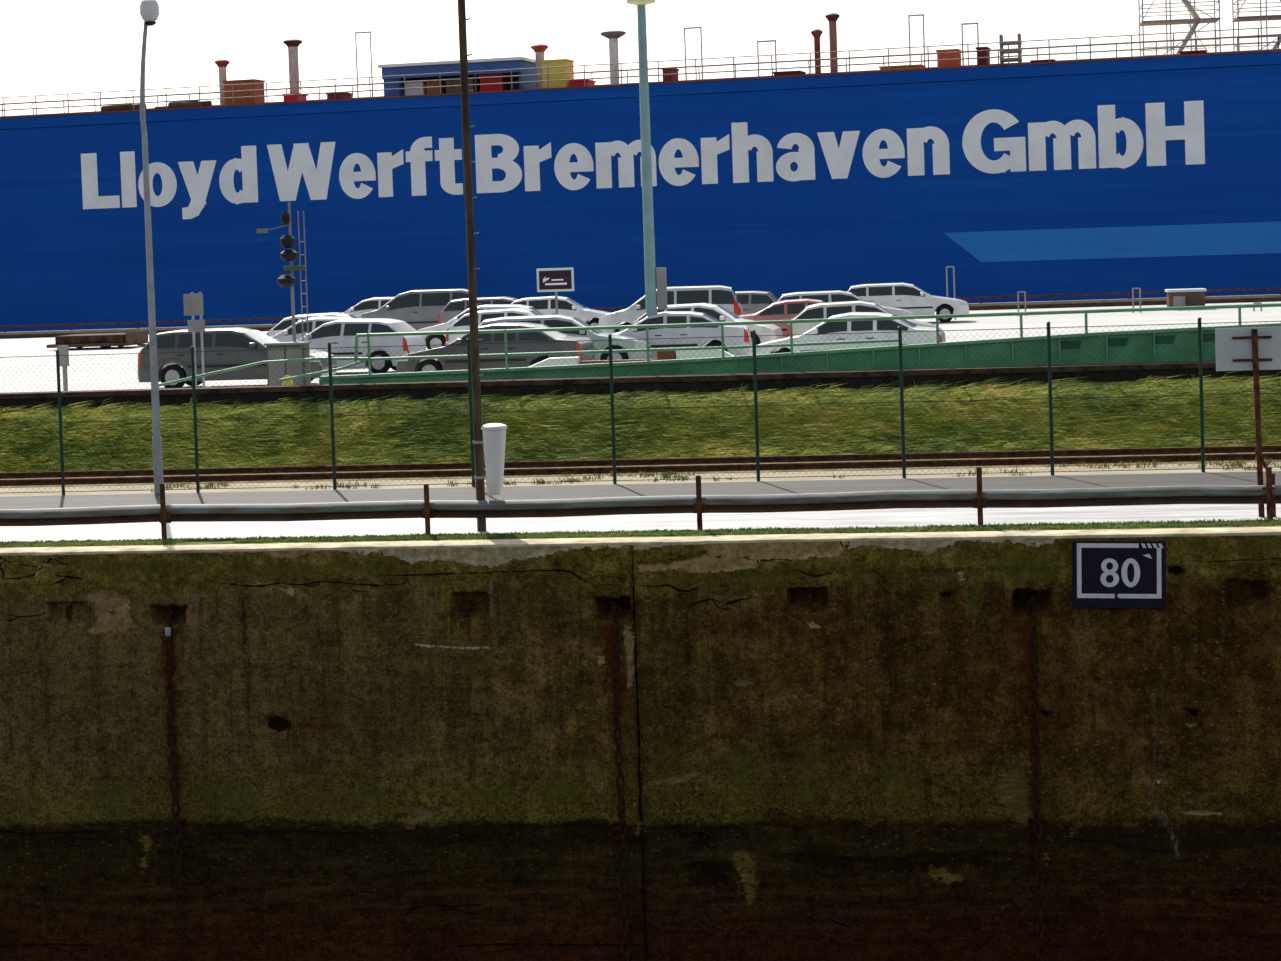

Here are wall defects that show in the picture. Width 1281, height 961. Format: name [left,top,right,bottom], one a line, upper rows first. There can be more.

spalling [0,554,57,579]
crack [211,569,751,610]
spalling [80,590,136,635]